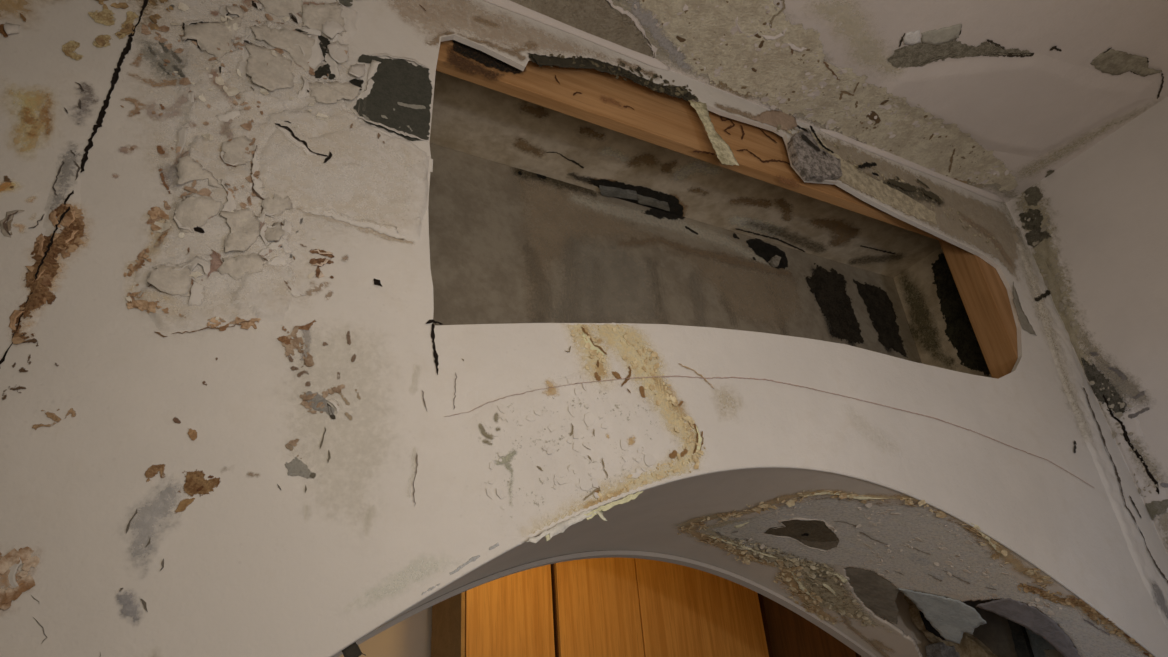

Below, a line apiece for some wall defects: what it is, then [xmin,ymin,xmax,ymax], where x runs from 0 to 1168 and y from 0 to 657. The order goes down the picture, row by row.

crack [53,0,148,233]
peeling [147,136,295,306]
spalling [180,0,1034,378]
spalling [1090,47,1164,99]
crack [0,291,33,364]
peeling [705,491,1142,657]